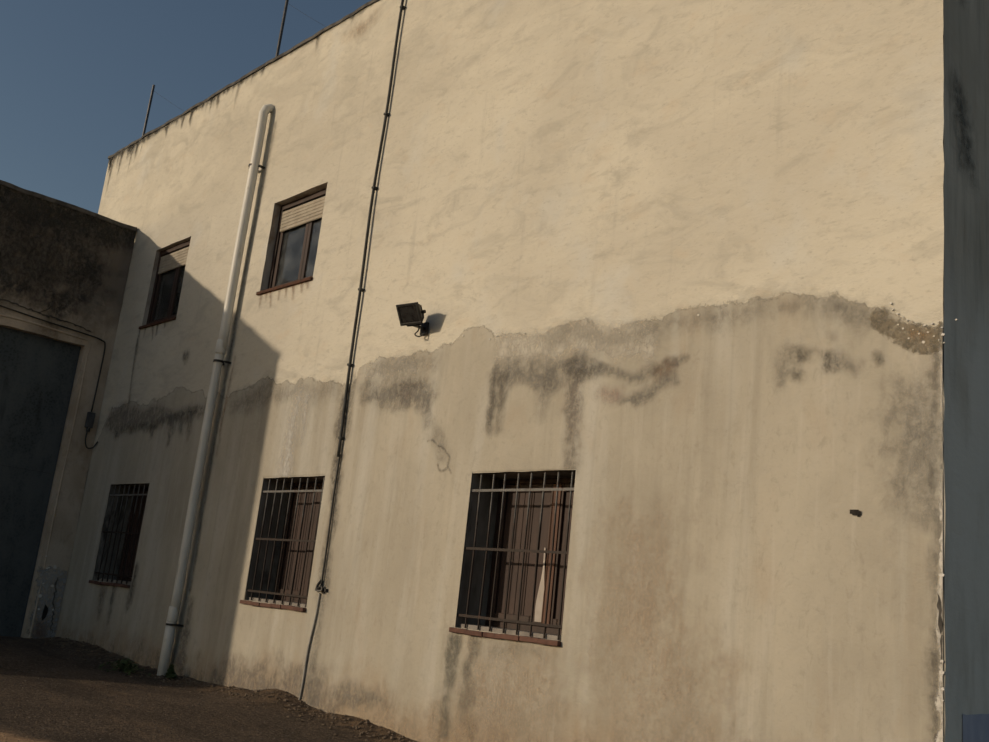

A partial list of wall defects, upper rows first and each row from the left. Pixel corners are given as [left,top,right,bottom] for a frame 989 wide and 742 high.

leakage [109,76,249,176]
leakage [0,186,136,325]
leakage [336,387,350,447]
leakage [362,380,430,406]
leakage [487,357,681,442]
leakage [330,460,341,526]
peeling [56,292,945,742]
leakage [219,659,335,713]
leakage [446,635,545,714]